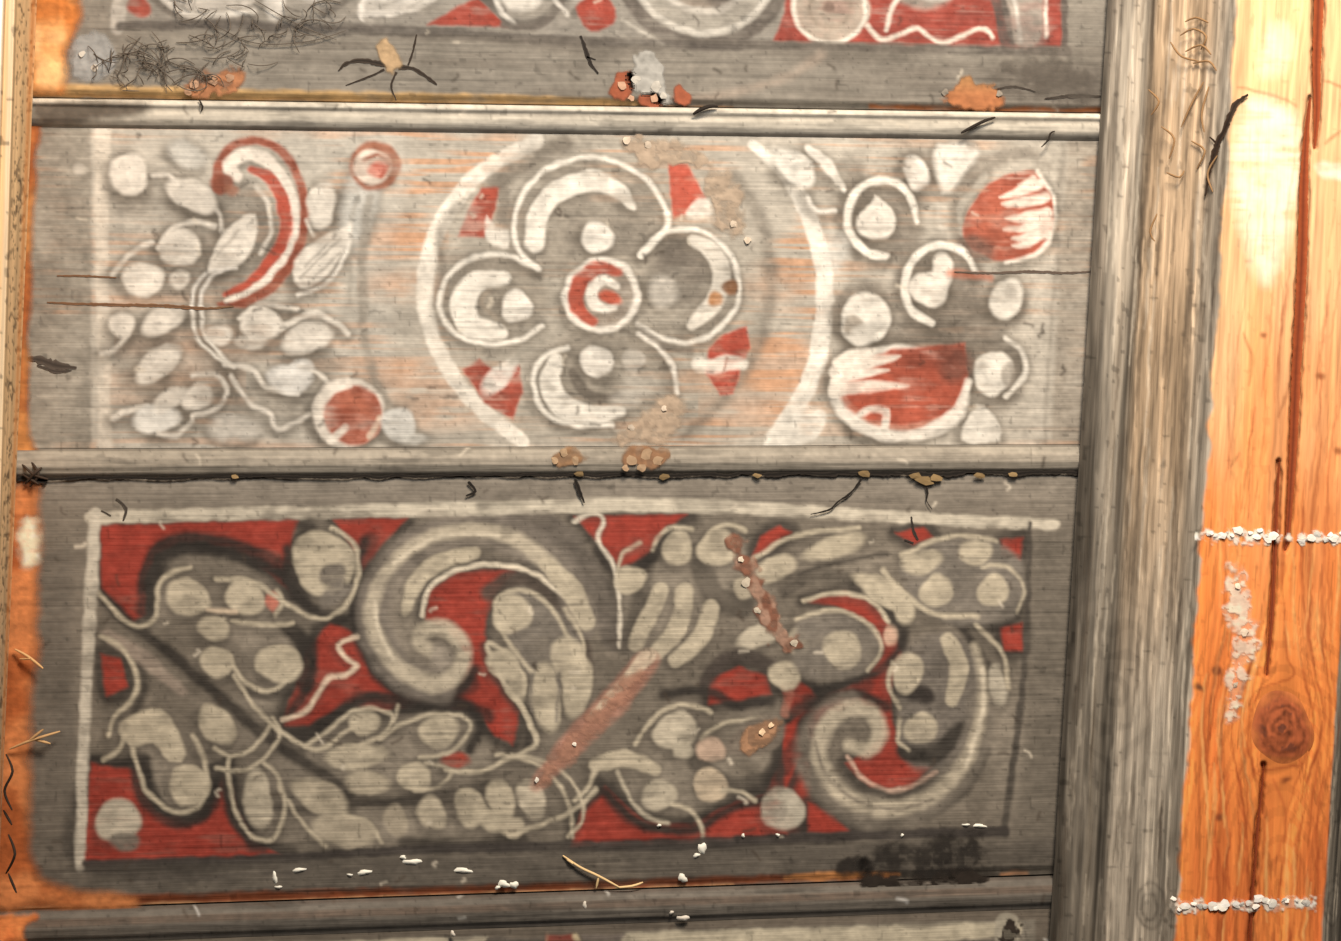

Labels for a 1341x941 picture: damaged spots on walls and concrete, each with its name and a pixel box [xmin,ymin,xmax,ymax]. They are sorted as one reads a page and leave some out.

peeling [609,50,691,107]
peeling [941,76,1004,111]
crack [1204,94,1248,196]
crack [1267,0,1324,675]
peeling [551,446,583,467]
damp [1195,526,1341,546]
damp [836,835,989,888]
crack [1249,764,1264,941]
damp [1170,895,1316,914]